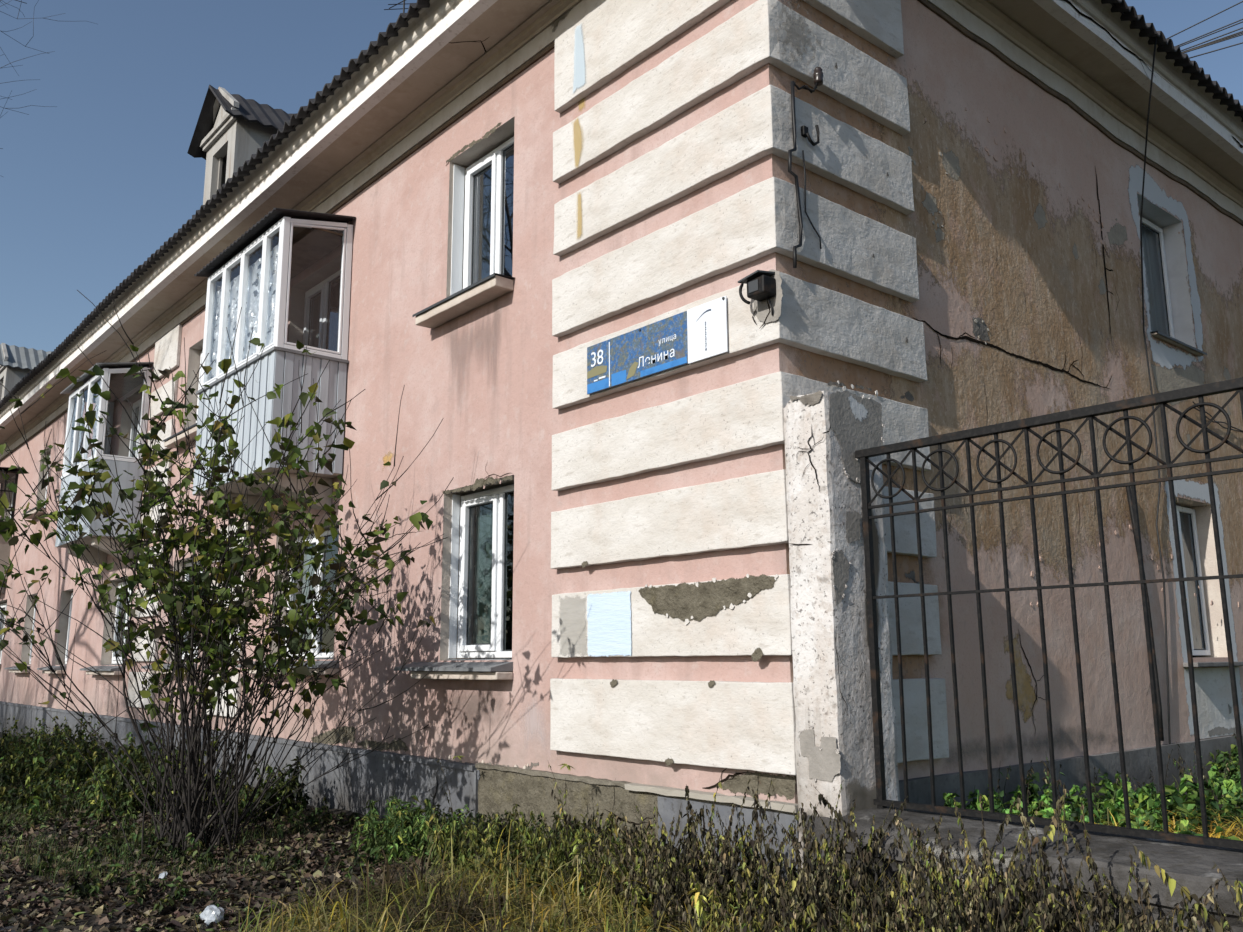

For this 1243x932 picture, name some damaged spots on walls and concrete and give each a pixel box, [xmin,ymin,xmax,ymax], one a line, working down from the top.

crack [1095,168,1113,341]
crack [912,317,1112,389]
flaking render [790,72,1243,606]
crack [796,425,832,492]
flaking render [639,574,779,625]
peeling [1004,634,1038,722]
peeling [721,726,841,800]